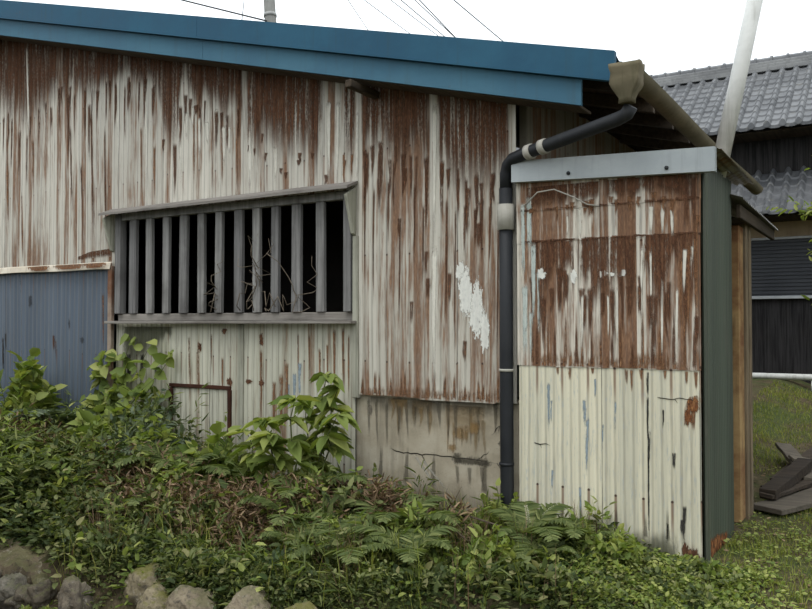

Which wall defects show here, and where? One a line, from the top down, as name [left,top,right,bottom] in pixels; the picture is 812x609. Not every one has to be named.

rust [0,40,322,241]
rust [342,83,508,345]
rust [28,249,112,271]
rust [521,174,700,427]
rust [246,329,349,417]
rust [361,373,499,402]
damp [453,453,489,466]